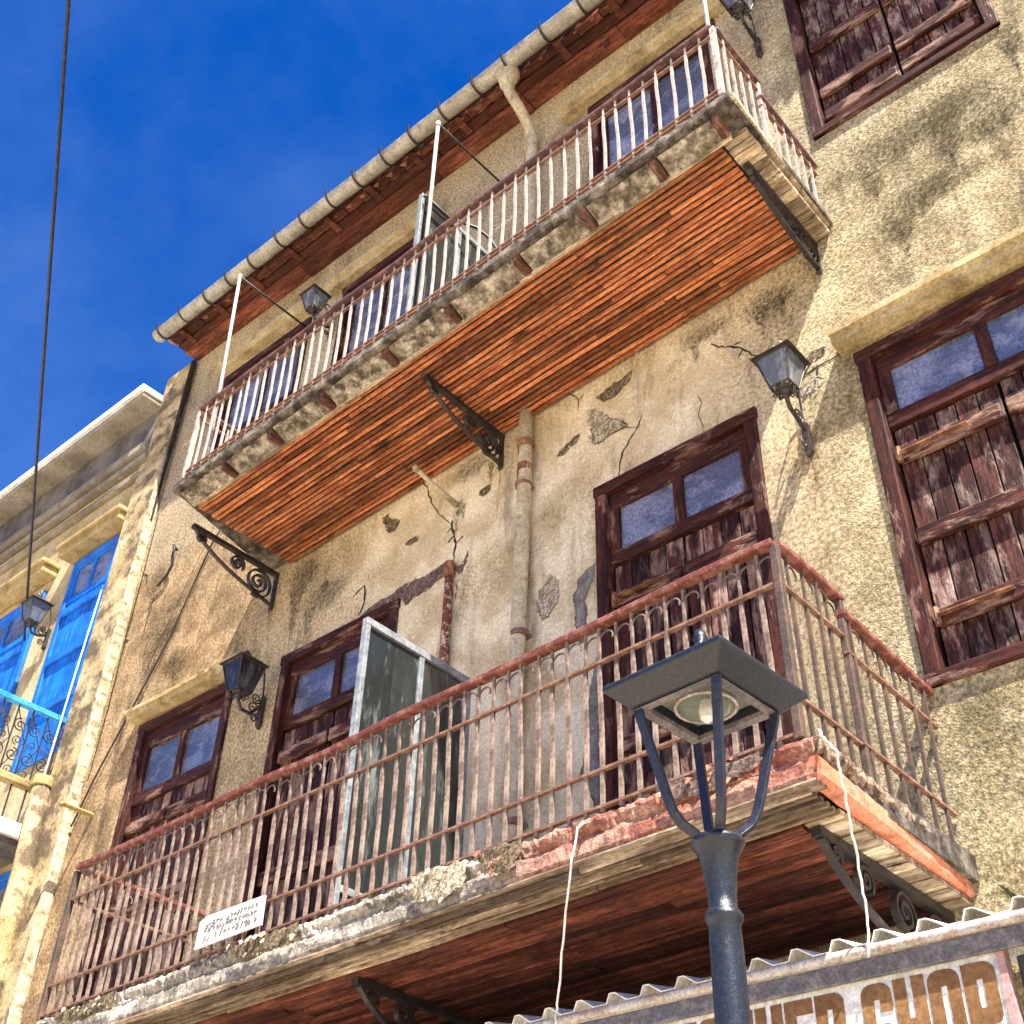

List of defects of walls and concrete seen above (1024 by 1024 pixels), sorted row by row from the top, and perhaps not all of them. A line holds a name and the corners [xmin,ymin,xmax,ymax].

crack [711,341,757,358]
spalling [557,369,632,457]
crack [618,415,642,474]
spalling [382,514,400,533]
crack [423,483,463,561]
peeling [360,550,468,617]
spalling [535,574,560,619]
peeling [573,562,596,644]
spalling [669,752,761,800]
spalling [408,836,522,904]